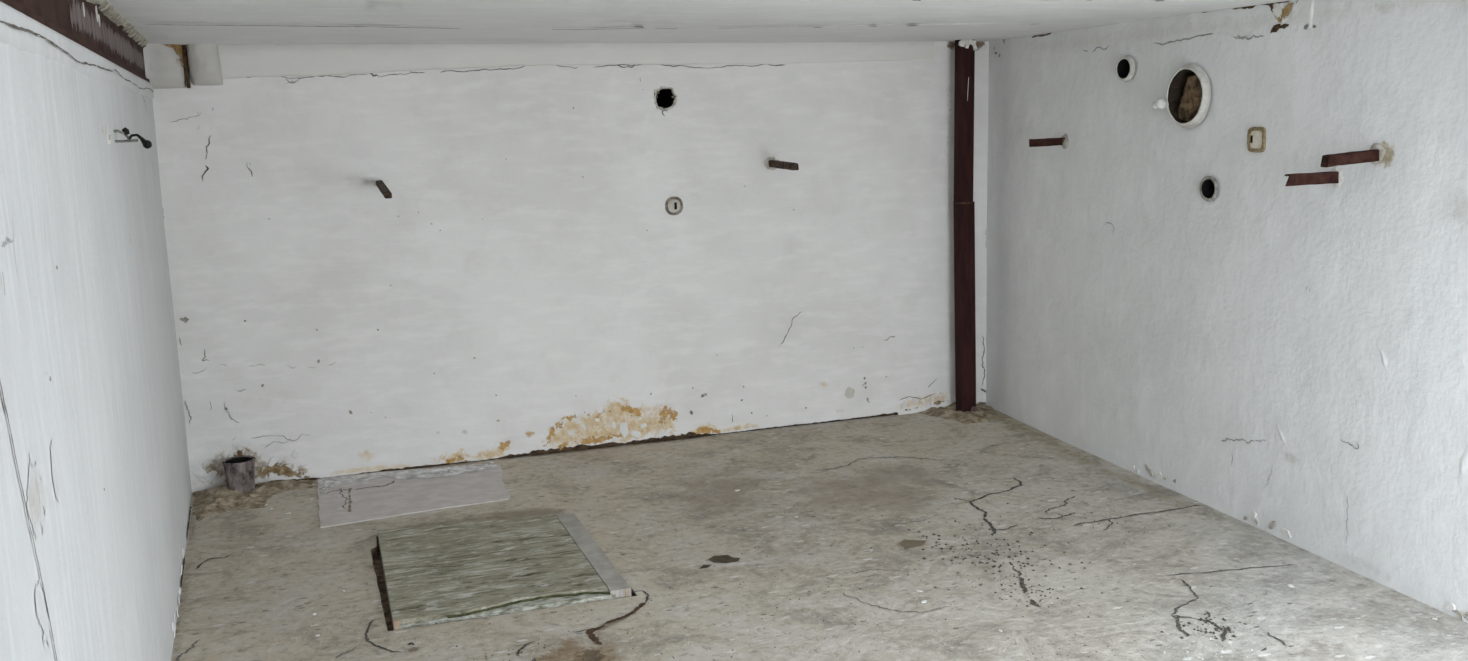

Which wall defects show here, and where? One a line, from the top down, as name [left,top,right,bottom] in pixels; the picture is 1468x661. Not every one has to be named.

crack [218,21,271,29]
crack [317,23,411,31]
spalling [1238,0,1316,40]
crack [0,21,213,180]
crack [246,64,782,116]
leakage [189,443,415,488]
crack [891,477,1199,536]
crack [1013,566,1041,607]
crack [578,590,649,645]